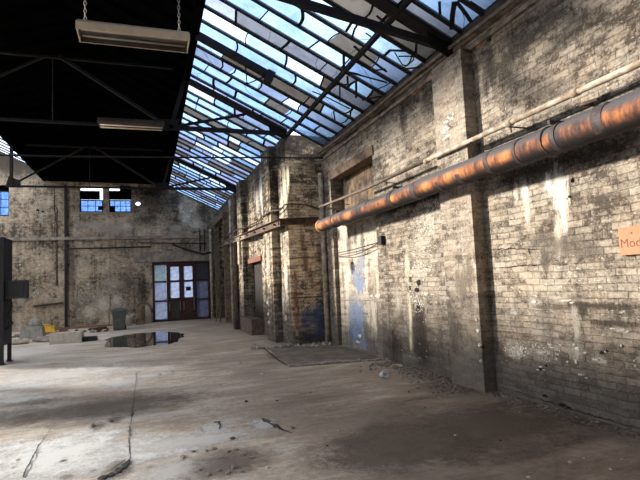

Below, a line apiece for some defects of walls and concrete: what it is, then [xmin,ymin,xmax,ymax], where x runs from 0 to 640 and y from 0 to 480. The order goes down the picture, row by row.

water stain [529,162,599,269]
peeling [346,253,380,349]
water stain [408,294,430,363]
water stain [551,302,636,327]
crack [23,419,57,477]
water stain [327,406,569,473]